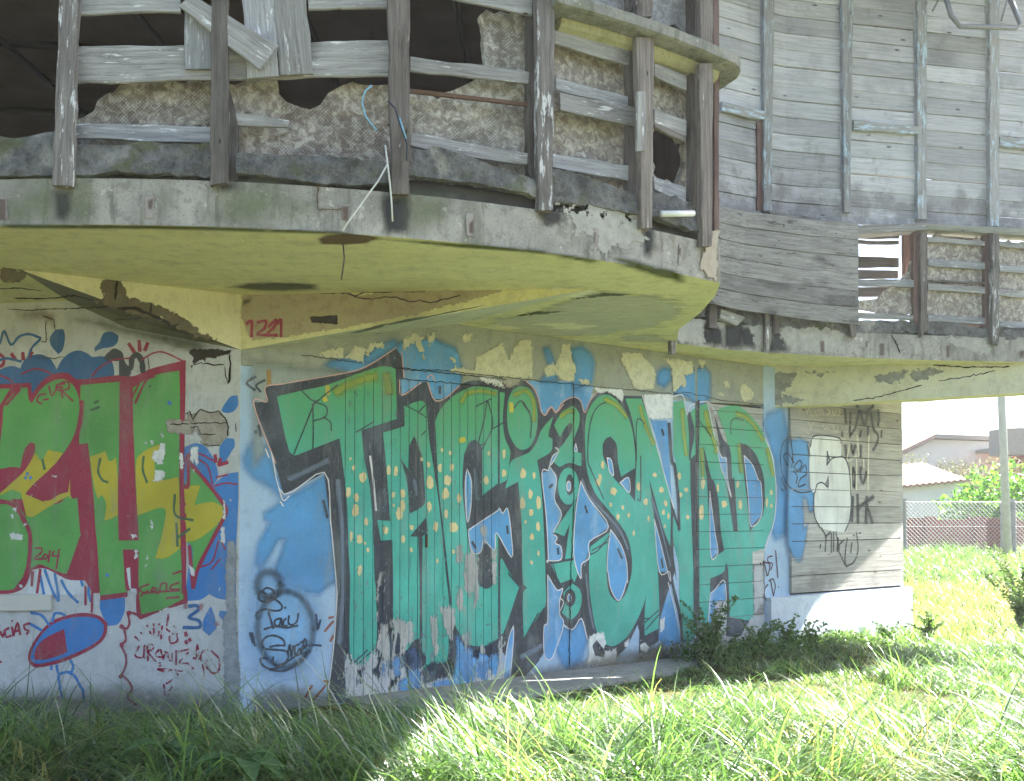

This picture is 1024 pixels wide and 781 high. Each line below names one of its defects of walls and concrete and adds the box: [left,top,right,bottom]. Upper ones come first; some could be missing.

spalling [0,268,27,283]
spalling [699,230,721,282]
spalling [93,279,231,384]
peeling [449,285,706,420]
peeling [775,370,836,407]
peeling [874,367,944,385]
crack [853,365,1010,401]
spalling [145,409,236,482]